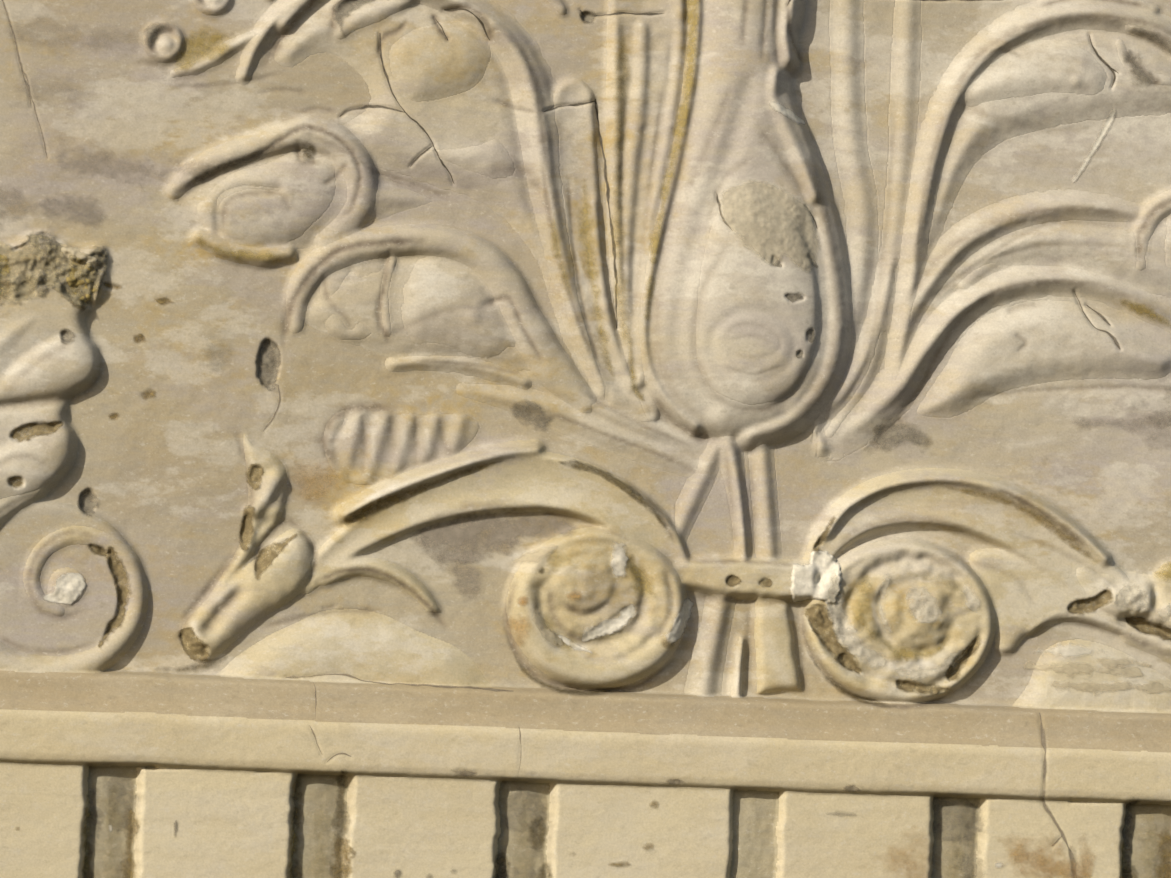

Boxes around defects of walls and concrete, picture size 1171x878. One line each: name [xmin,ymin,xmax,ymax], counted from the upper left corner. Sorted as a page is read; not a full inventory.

crack [2,0,47,156]
crack [340,34,454,183]
crack [544,99,617,328]
spalling [0,233,119,310]
spalling [247,464,264,490]
spalling [240,506,296,579]
spalling [813,519,833,552]
spalling [89,544,129,647]
spalling [179,628,209,661]
spalling [805,576,886,673]
spalling [897,635,979,694]
crack [1039,713,1077,878]